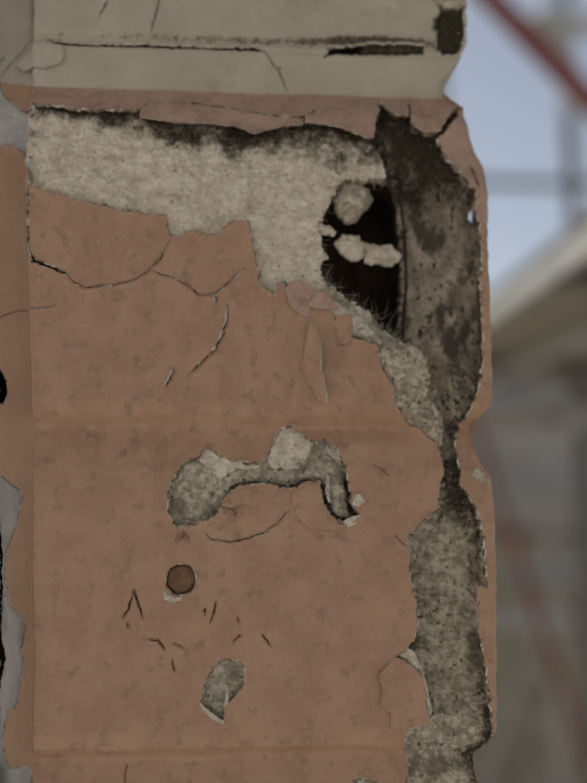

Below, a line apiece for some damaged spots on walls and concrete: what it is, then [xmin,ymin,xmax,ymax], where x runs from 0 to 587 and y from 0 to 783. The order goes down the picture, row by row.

crack [4,1,288,92]
crack [325,44,424,58]
spalling [432,0,464,51]
crack [28,194,246,386]
spalling [26,102,492,783]